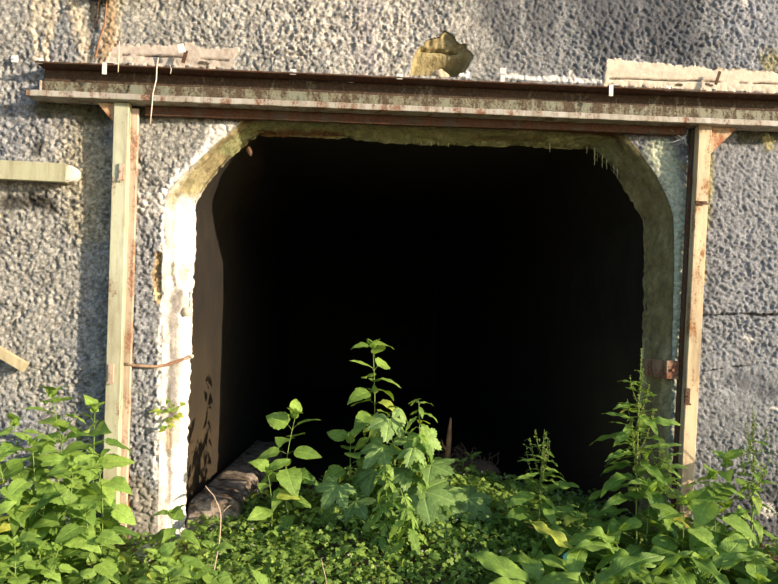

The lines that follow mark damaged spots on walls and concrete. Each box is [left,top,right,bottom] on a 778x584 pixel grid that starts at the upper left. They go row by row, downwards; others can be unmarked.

spalling [410,30,474,79]
spalling [152,252,162,304]
crack [706,310,778,318]